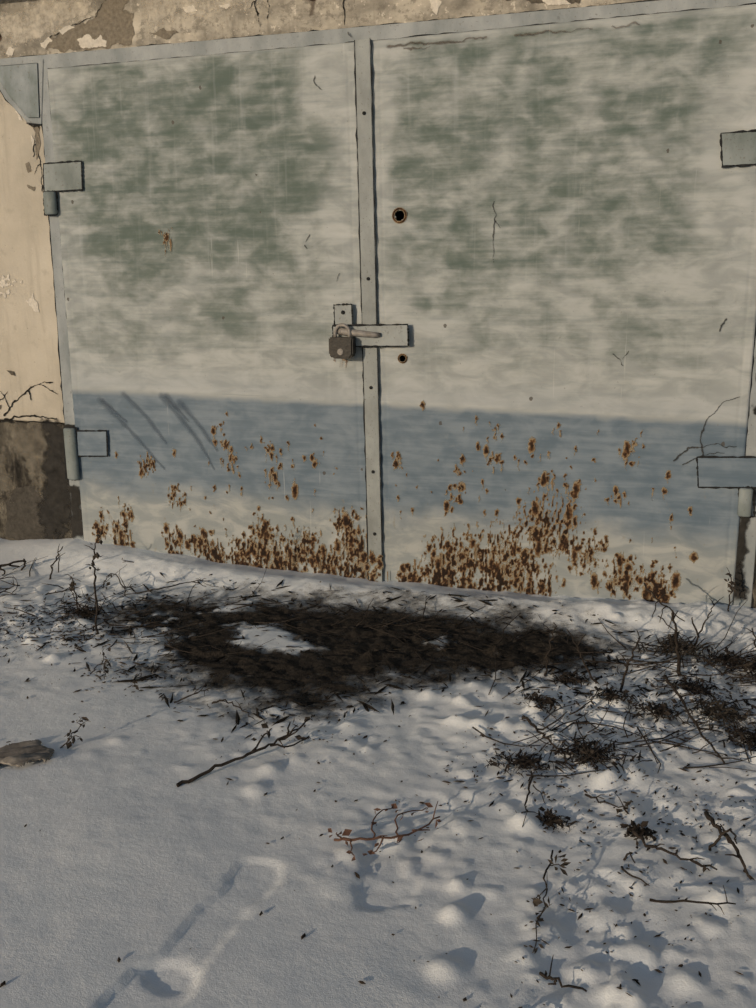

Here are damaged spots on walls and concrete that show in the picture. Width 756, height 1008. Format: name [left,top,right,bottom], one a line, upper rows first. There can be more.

peeling [0,0,134,56]
peeling [143,0,247,39]
leakage [0,423,47,496]
rust [137,452,156,479]
rust [91,496,135,548]
rust [161,412,681,604]